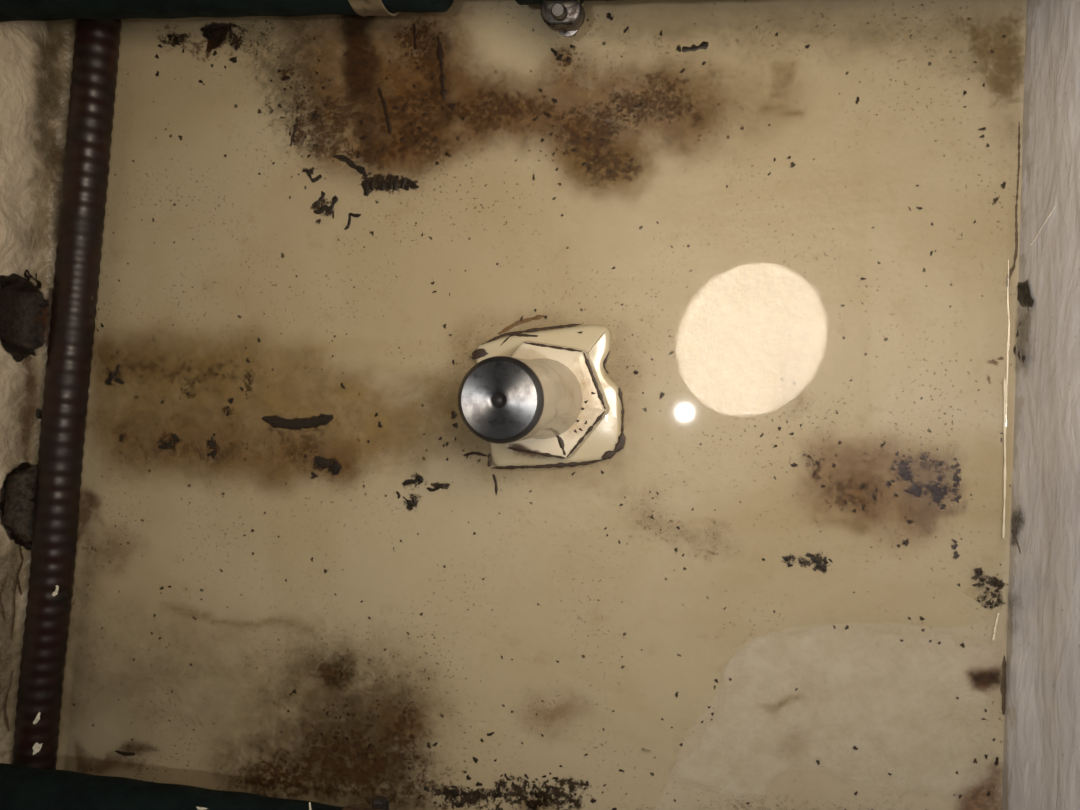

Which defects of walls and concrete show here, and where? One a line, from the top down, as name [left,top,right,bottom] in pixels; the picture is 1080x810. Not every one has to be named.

corrosion [300,15,716,185]
spalling [0,269,53,362]
water stain [499,309,547,334]
water stain [100,330,458,478]
spalling [0,462,37,639]
water stain [229,648,604,810]